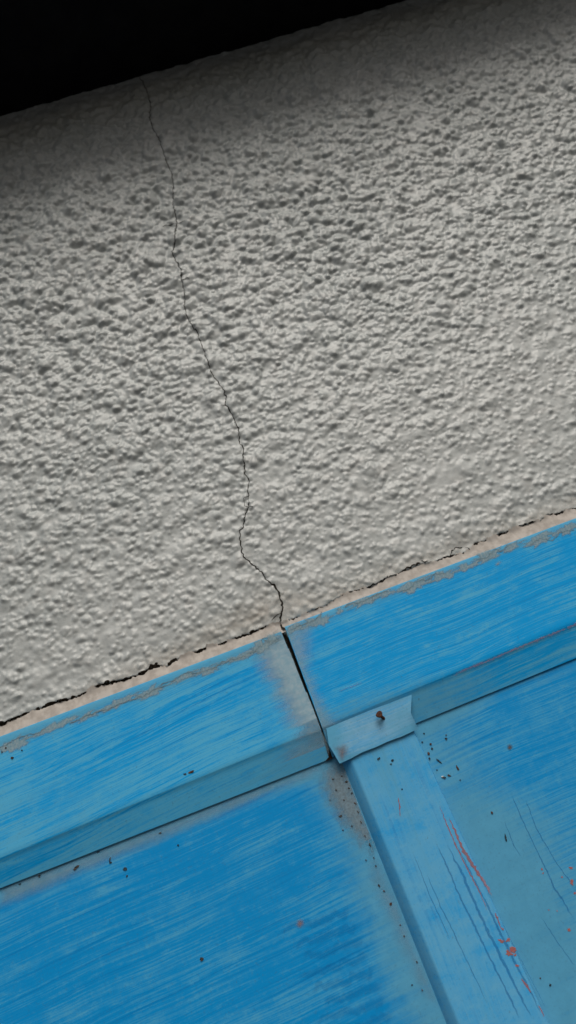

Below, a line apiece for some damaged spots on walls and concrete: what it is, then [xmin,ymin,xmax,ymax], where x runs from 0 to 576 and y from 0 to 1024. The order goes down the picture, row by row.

crack [0,79,576,726]